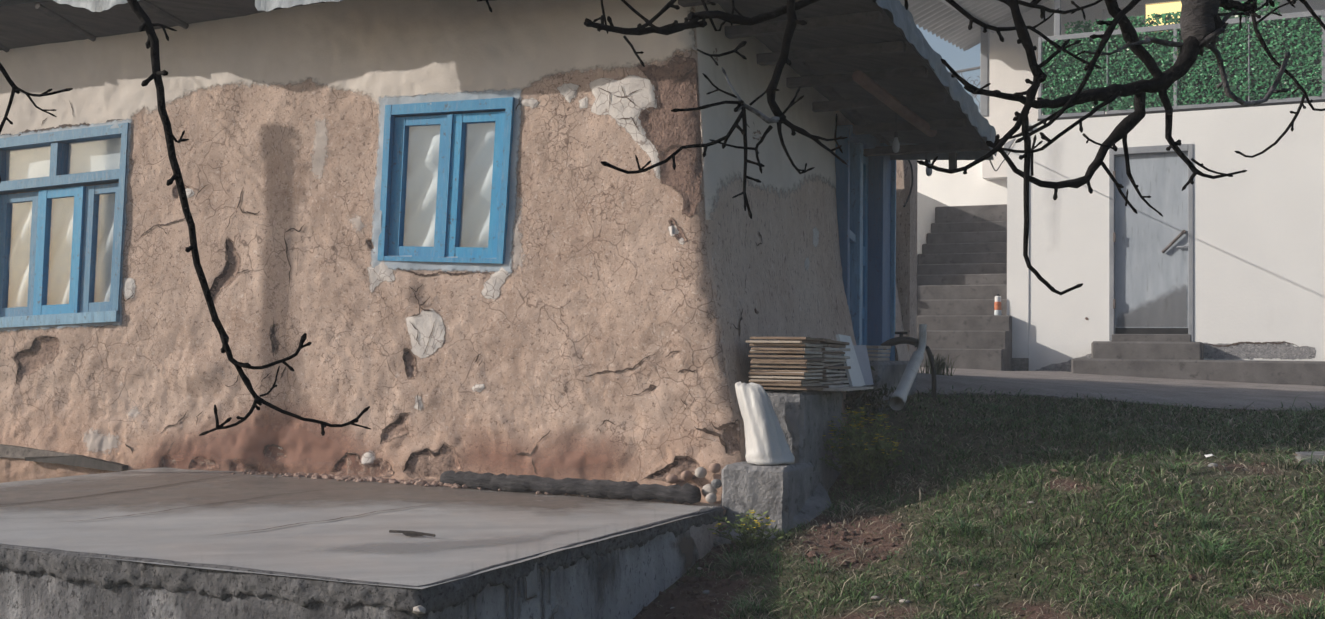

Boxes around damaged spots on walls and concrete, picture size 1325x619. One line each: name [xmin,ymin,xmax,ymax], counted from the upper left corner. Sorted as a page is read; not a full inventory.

peeling [520,98,538,109]
spalling [557,55,703,245]
spalling [210,236,248,302]
peeling [350,216,395,293]
spalling [13,335,59,385]
peeling [402,290,445,380]
damp [0,417,612,509]
spalling [330,395,461,481]
crack [515,430,551,474]